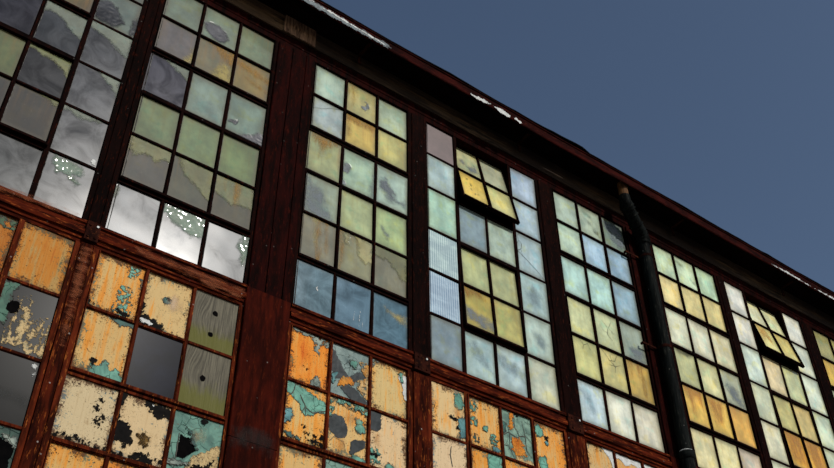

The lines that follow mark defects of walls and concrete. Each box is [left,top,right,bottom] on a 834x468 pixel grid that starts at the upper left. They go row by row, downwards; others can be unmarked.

peeling [0,214,18,231]
peeling [0,279,52,375]
peeling [110,266,164,330]
peeling [86,357,122,382]
peeling [284,327,394,468]
peeling [399,372,407,400]
peeling [0,433,18,468]
peeling [51,392,221,468]
peeling [449,393,549,468]